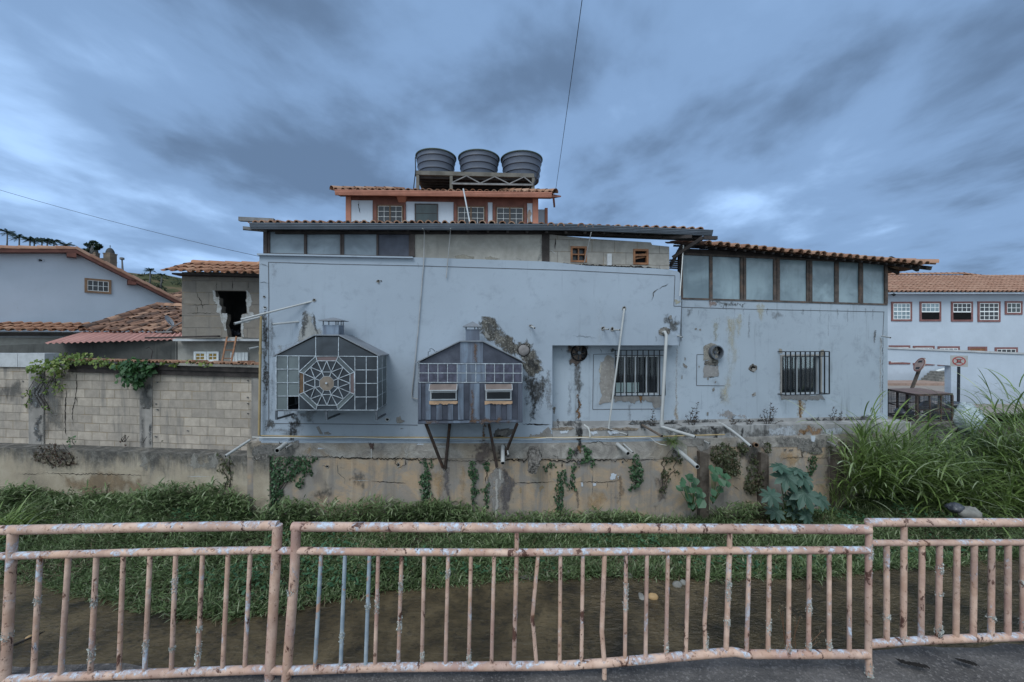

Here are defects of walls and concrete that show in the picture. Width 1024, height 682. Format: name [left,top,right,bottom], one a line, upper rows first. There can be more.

crack [551,238,669,299]
spalling [213,290,227,331]
peeling [599,355,661,408]
damp [486,435,515,517]